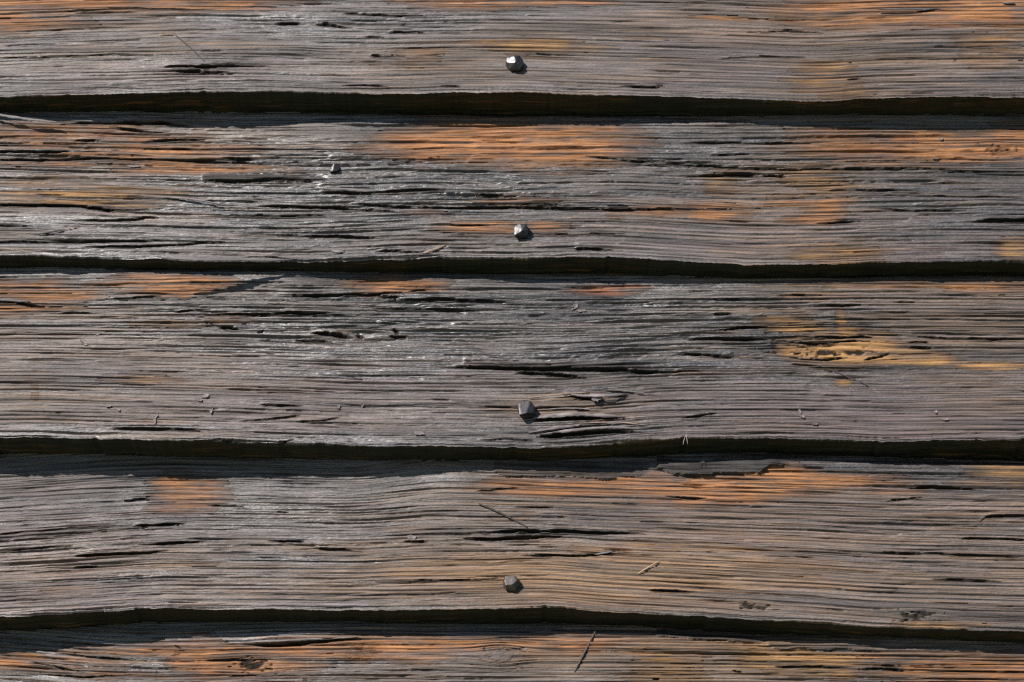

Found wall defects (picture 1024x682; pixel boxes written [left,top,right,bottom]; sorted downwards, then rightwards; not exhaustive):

crack [0,7,272,75]
crack [776,293,861,308]
crack [429,297,1024,441]
crack [459,487,646,558]